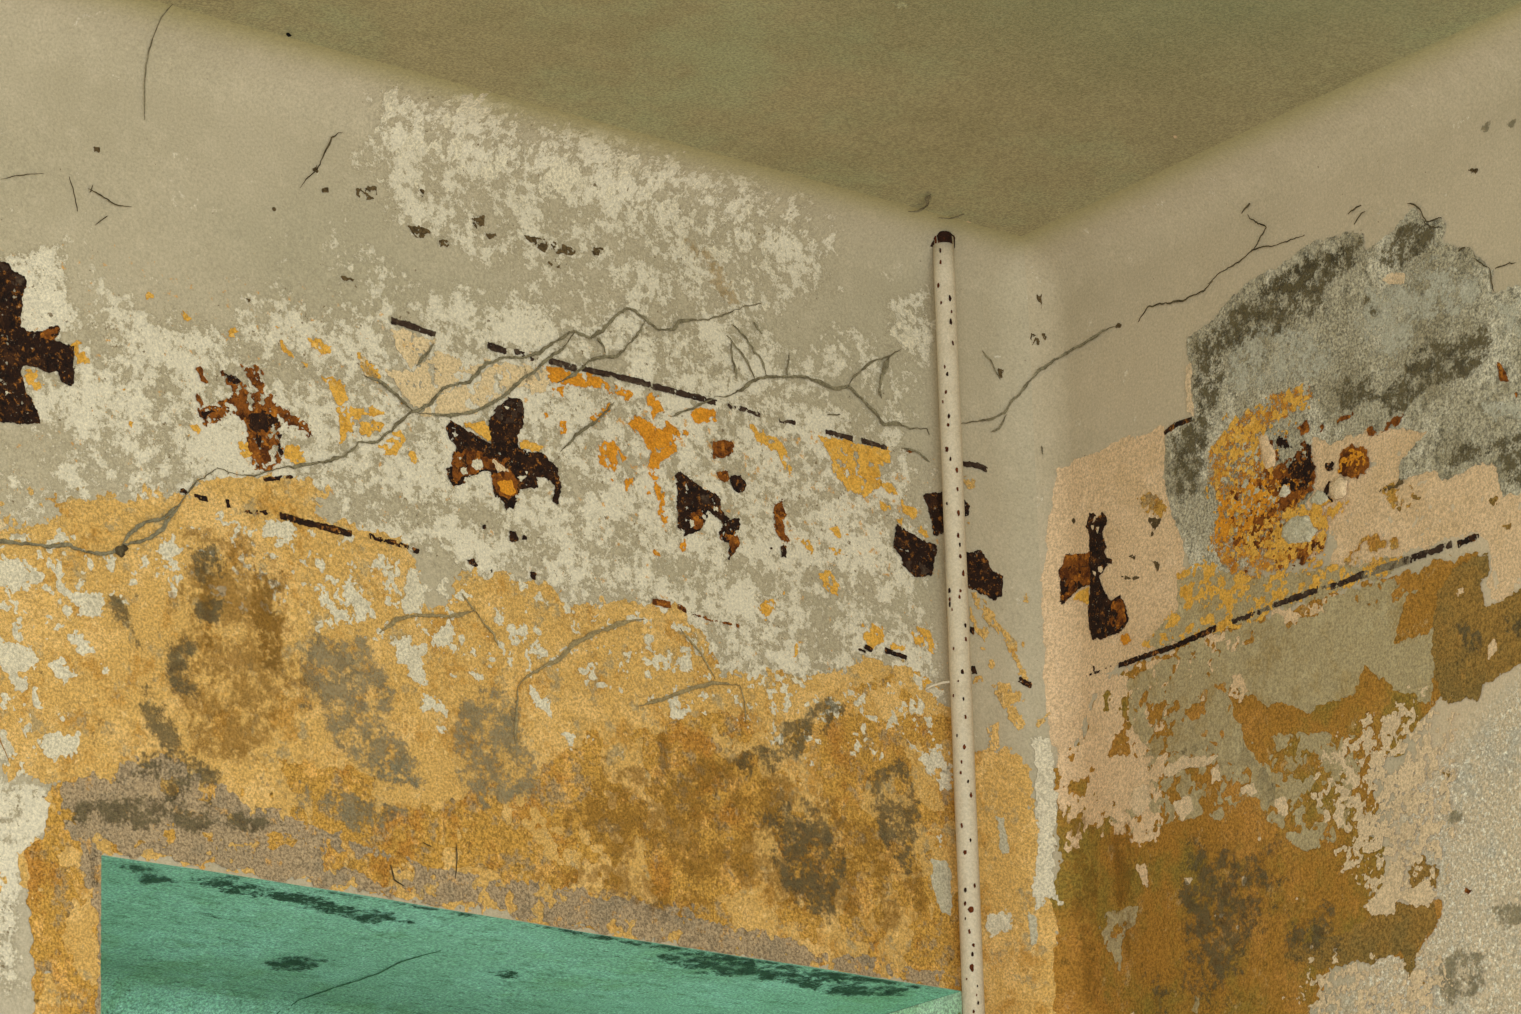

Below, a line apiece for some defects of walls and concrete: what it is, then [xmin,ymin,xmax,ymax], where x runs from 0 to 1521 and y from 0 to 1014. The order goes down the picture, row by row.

corrosion [451,449,518,499]
peeling [357,328,717,523]
crack [0,203,1304,557]
leakage [1171,237,1363,504]
corrosion [1204,383,1353,589]
corrosion [1338,414,1404,479]
crack [379,593,498,646]
peeling [0,435,962,1014]
crack [514,618,645,744]
peeling [969,207,1521,1014]
leakage [111,863,476,924]
leakage [536,925,926,997]